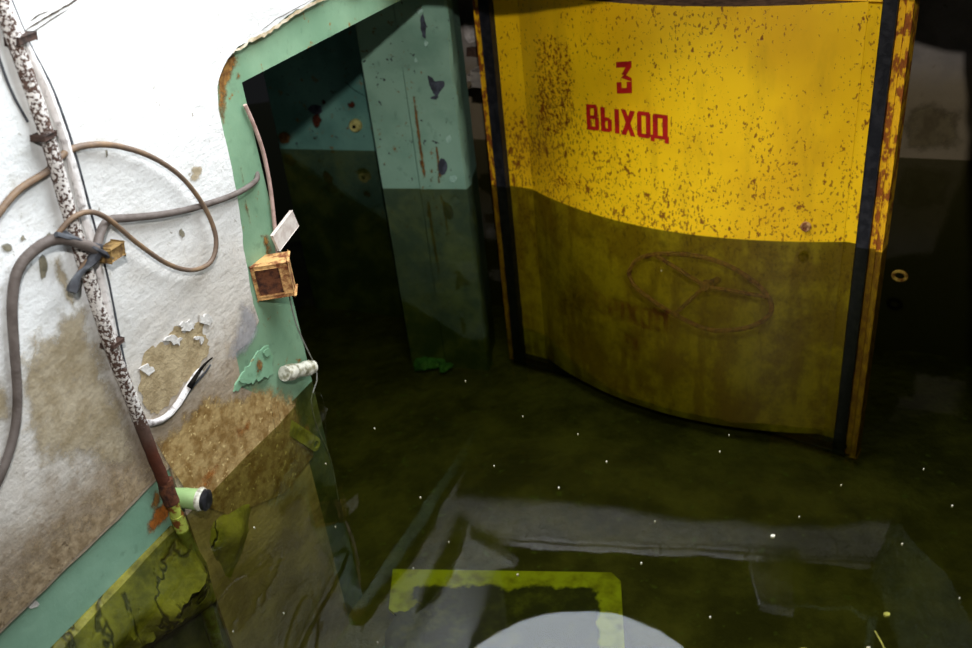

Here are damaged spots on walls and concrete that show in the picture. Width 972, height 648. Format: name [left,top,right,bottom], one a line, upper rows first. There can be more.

crack [25,0,77,31]
flaking render [138,314,213,414]
peeling [233,345,273,392]
leakage [0,254,155,629]
leakage [157,388,313,515]